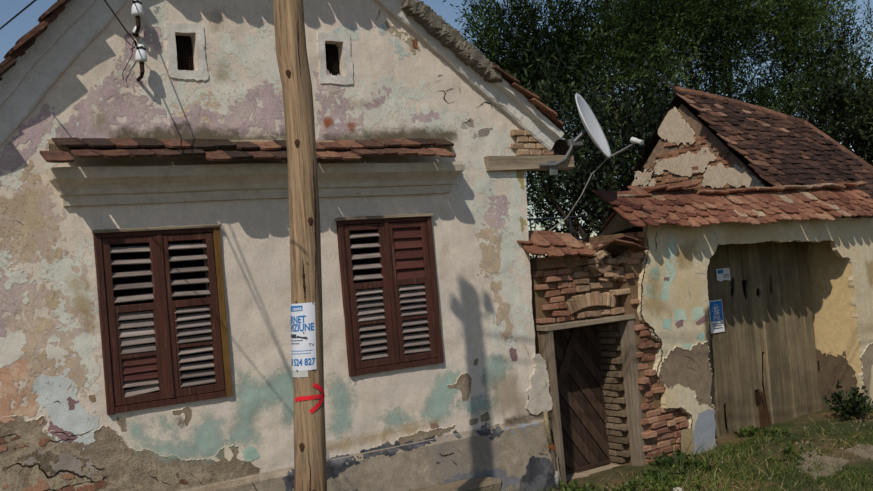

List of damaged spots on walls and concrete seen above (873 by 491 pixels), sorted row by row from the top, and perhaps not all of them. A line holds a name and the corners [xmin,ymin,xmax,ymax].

spalling [375,20,420,60]
peeling [0,0,295,491]
peeling [313,67,544,479]
spalling [645,234,717,455]
spalling [816,342,873,409]
crack [0,433,109,491]
crack [49,430,91,442]
peeling [443,456,556,491]